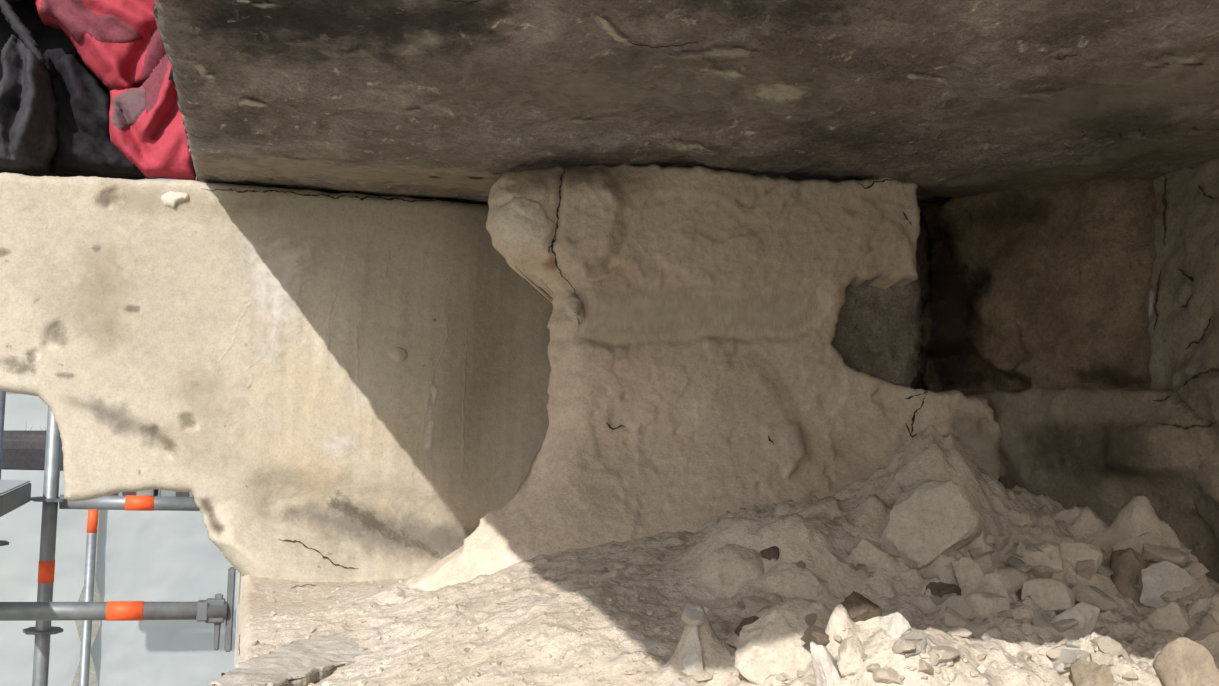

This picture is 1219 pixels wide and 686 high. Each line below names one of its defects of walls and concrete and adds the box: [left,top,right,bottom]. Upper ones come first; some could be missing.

water stain [216,237,348,389]
crack [548,168,578,296]
spalling [407,141,1002,591]
crack [1153,175,1219,430]
crack [279,539,359,589]
water stain [293,510,466,554]